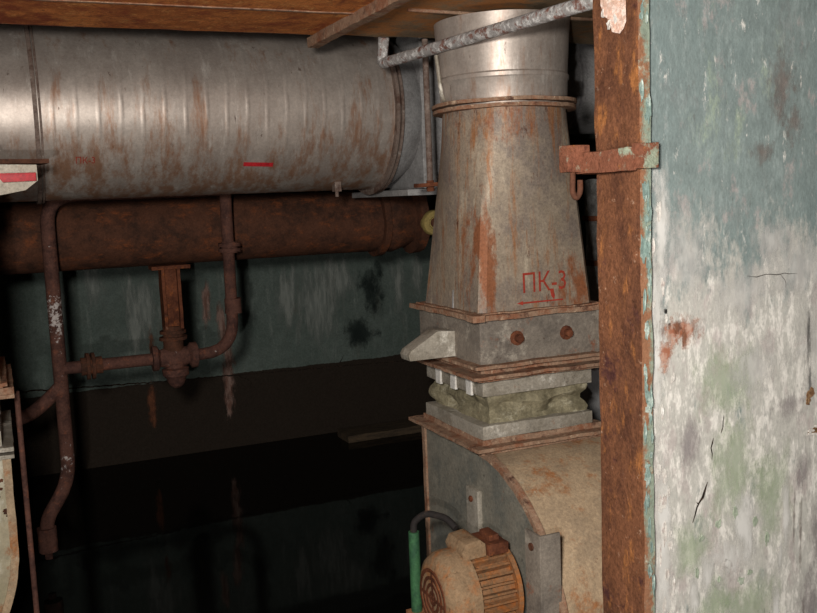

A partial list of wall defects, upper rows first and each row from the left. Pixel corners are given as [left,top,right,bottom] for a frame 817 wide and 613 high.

peeling [600,0,626,33]
peeling [639,79,651,124]
leakage [279,260,352,338]
leakage [361,261,384,312]
leakage [348,321,371,346]
corrosion [659,320,697,373]
peeling [640,174,676,613]
crack [692,484,707,523]
peeling [690,497,758,613]